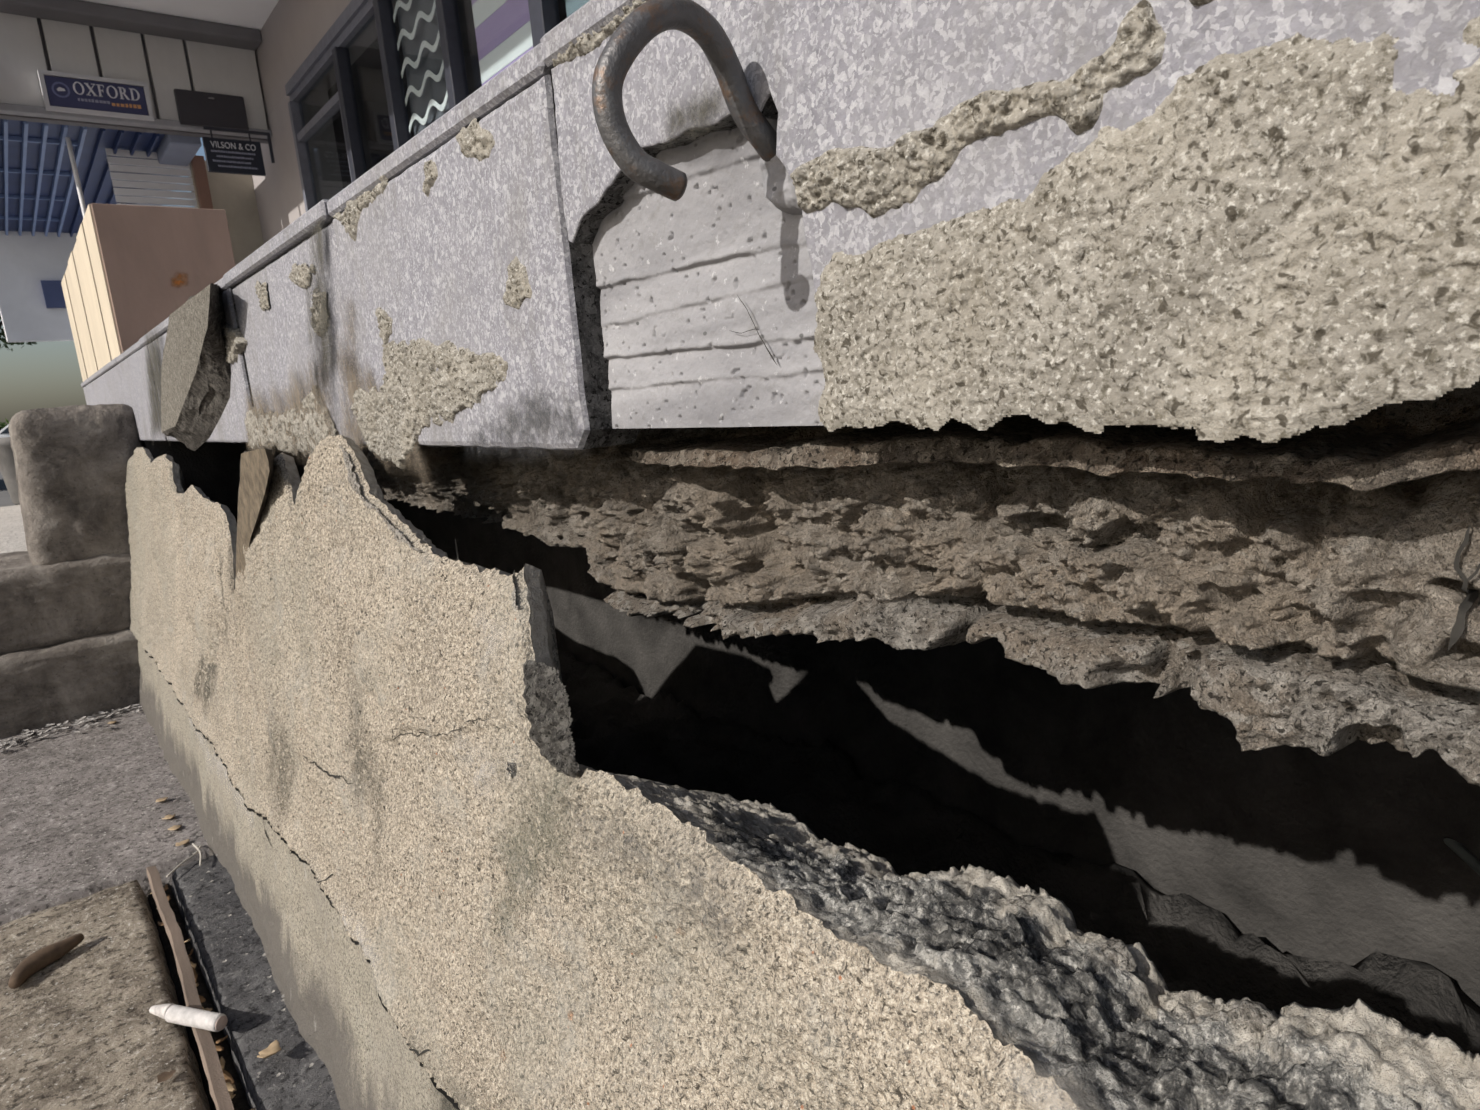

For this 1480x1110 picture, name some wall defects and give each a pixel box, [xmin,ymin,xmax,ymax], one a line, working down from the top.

crack [144,650,460,1110]
crack [383,717,496,743]
spalling [338,128,1480,786]
crack [1448,525,1480,651]